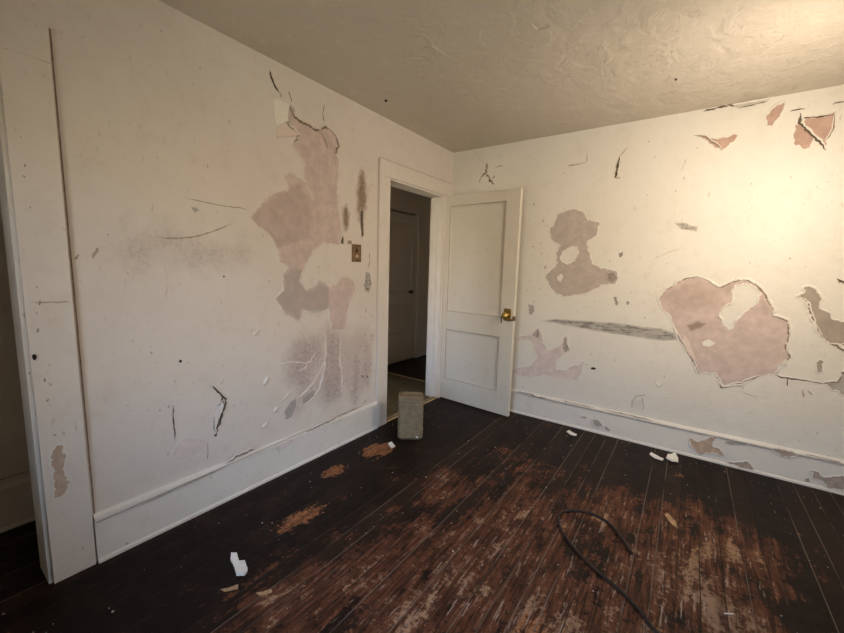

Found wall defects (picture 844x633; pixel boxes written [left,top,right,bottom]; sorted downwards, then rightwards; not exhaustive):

peeling [694,133,739,151]
peeling [794,112,835,150]
peeling [249,98,371,332]
peeling [543,208,619,297]
peeling [512,328,592,381]
peeling [643,275,794,388]
peeling [794,284,844,351]
peeling [814,359,844,401]
peeling [48,434,72,501]
peeling [805,470,844,491]